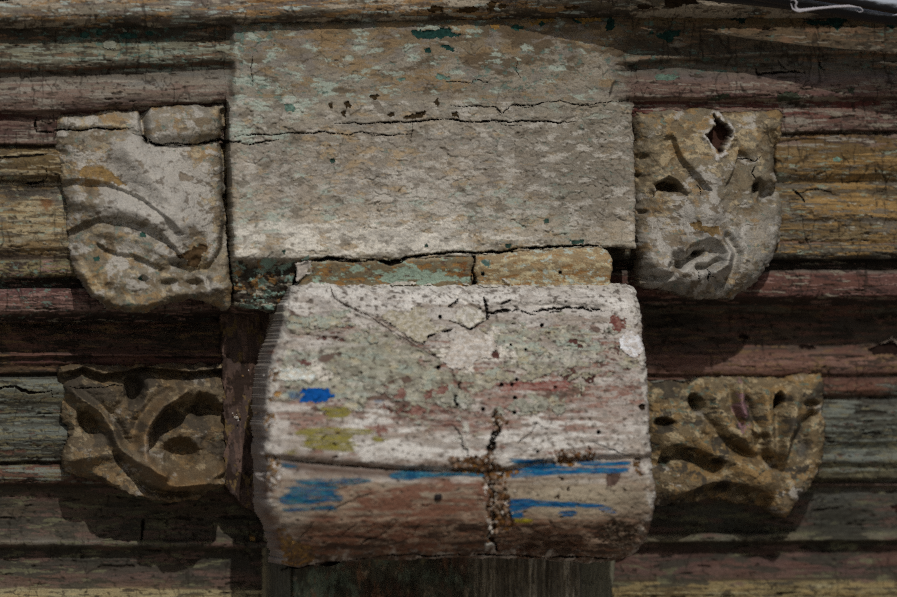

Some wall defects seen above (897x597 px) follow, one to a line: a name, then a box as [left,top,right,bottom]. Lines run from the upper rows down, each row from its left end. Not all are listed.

peeling [456,1,509,13]
peeling [411,27,461,53]
peeling [387,98,440,119]
crack [0,99,629,185]
crack [762,252,897,273]
crack [314,244,637,360]
peeling [381,306,500,370]
peeling [609,315,643,357]
peeling [274,359,317,383]
peeling [335,365,471,448]
peeling [494,367,613,416]
crack [275,384,610,570]